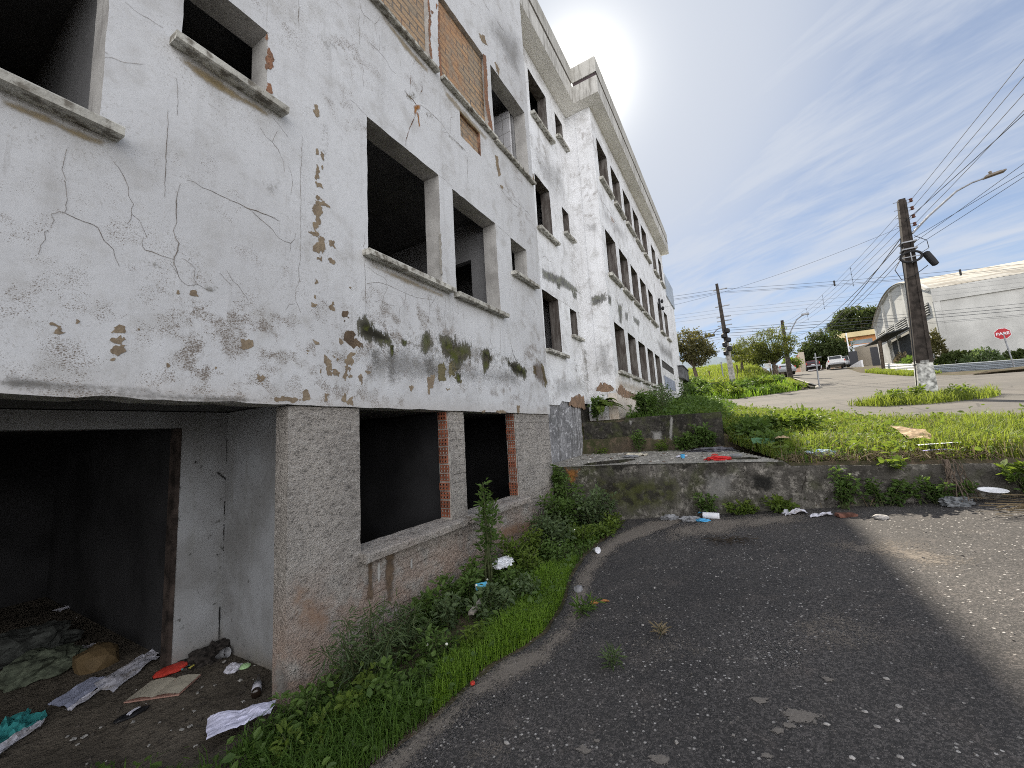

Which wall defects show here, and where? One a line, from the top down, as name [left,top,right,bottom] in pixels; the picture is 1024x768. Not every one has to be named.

flaking render [265,34,275,94]
crack [38,149,119,265]
crack [113,86,302,312]
peeling [308,148,336,264]
peeling [110,324,140,361]
peeling [307,280,371,406]
damp [534,364,545,385]
flaking render [569,394,586,410]
flaking render [596,382,636,401]